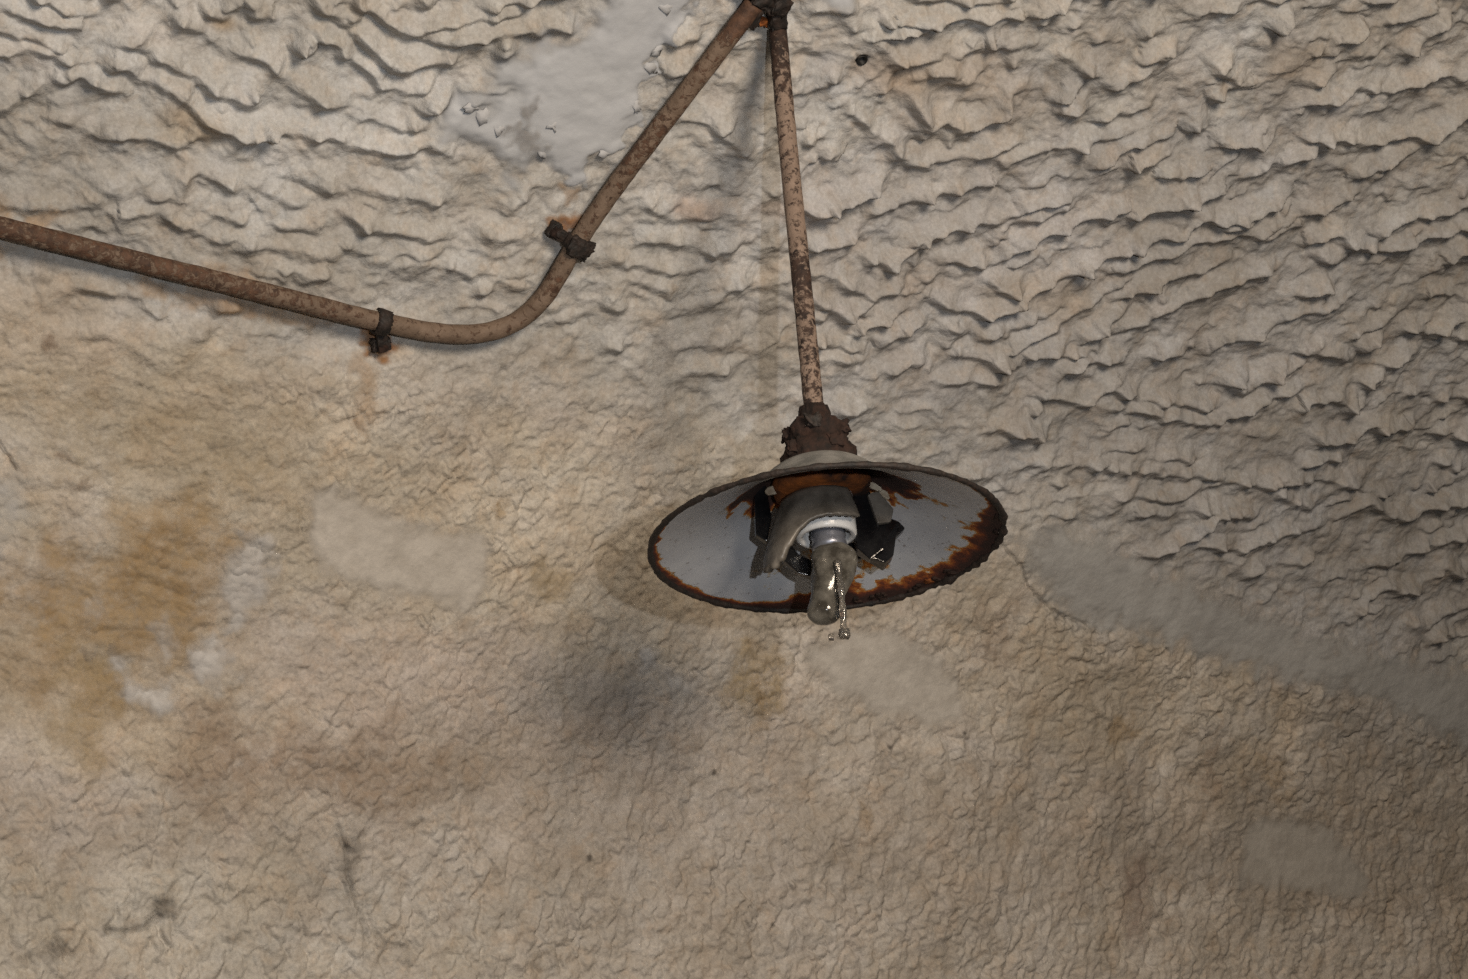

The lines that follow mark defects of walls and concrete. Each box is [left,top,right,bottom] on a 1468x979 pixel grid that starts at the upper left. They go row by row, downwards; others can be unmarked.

peeling [441,0,706,188]
water stain [29,521,192,713]
water stain [172,636,226,682]
water stain [224,537,271,630]